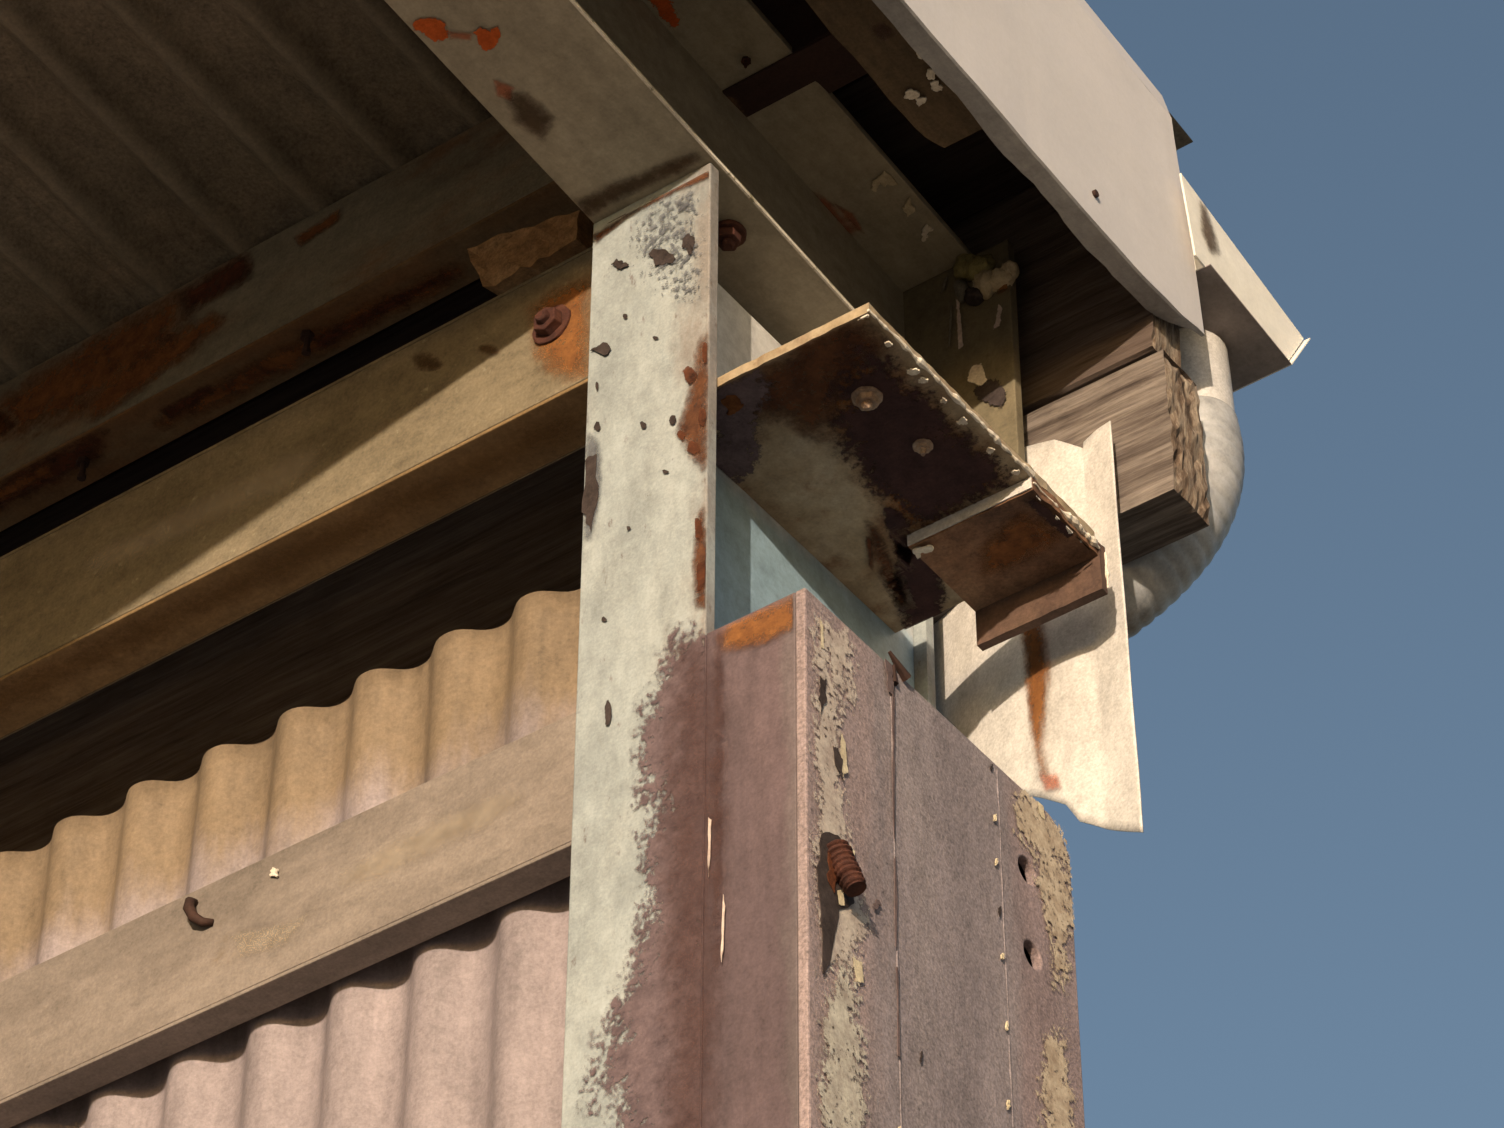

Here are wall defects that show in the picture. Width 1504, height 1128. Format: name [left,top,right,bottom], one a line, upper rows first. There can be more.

rust [180,256,253,313]
rust [0,432,104,511]
rust [677,319,1013,630]
rust [720,595,793,648]
rust [1022,625,1058,788]
peeling [808,611,876,1128]
peeling [993,789,1075,995]
peeling [1035,1018,1078,1128]